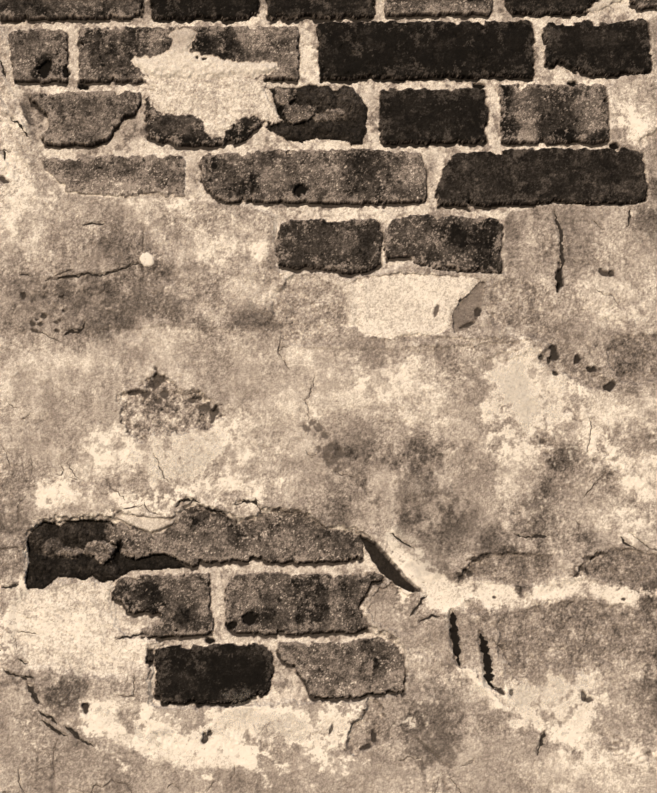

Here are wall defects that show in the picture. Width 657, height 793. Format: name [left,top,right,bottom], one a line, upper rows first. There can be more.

flaking render [0,0,657,392]
crack [554,211,566,274]
flaking render [116,370,222,443]
crack [620,534,657,551]
crack [116,632,149,640]
flaking render [11,497,427,757]
crack [410,596,502,691]
crack [0,631,132,793]
flaking render [420,764,462,793]